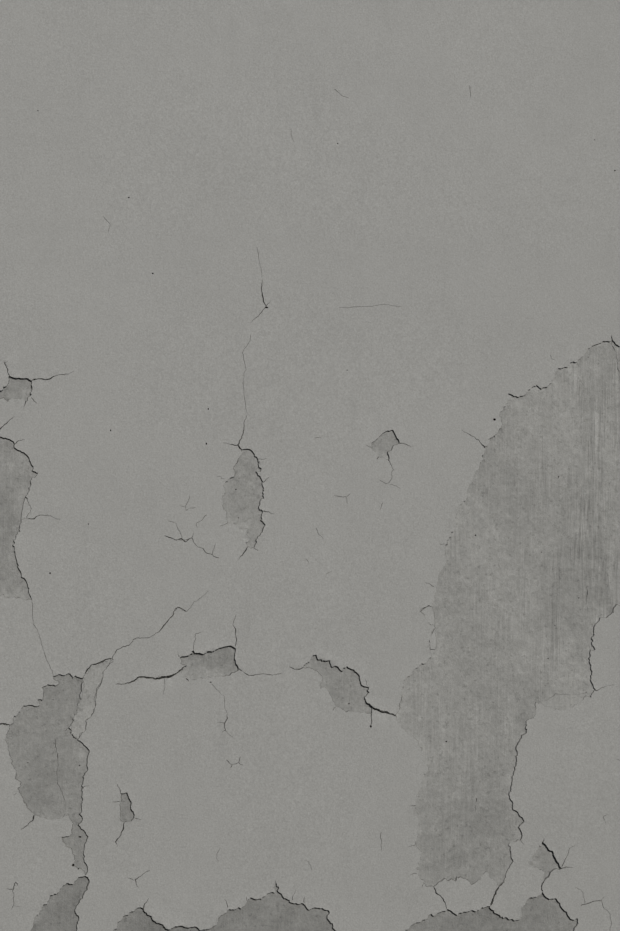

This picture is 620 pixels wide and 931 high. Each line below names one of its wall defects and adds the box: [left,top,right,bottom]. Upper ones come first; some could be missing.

crack [242,249,270,408]
peeling [0,418,56,600]
peeling [218,416,275,557]
peeling [370,430,409,470]
crack [78,598,200,740]
peeling [178,616,239,683]
peeling [303,655,373,724]
peeling [395,336,620,931]
peeling [5,673,90,931]
peeling [115,785,141,844]
peeling [113,883,336,931]